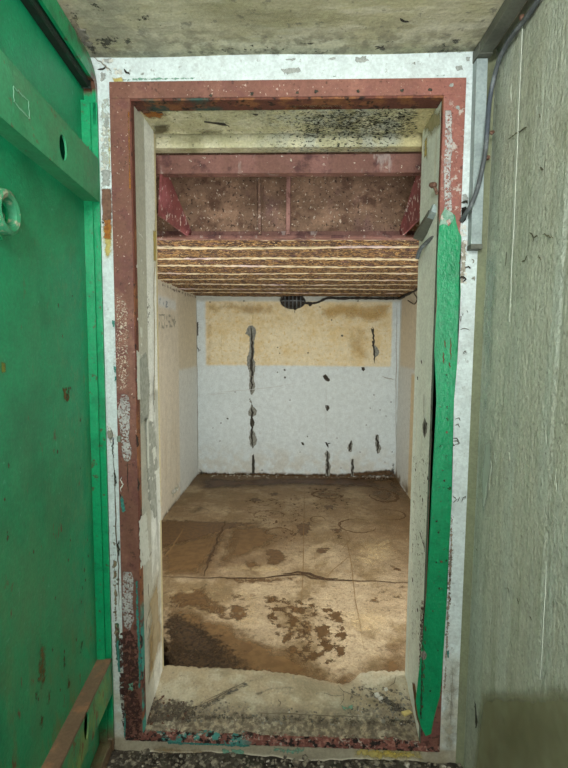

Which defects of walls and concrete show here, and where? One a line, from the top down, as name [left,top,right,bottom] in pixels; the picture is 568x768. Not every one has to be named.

peeling [107,294,161,660]
rust [116,581,161,738]
water stain [169,586,348,680]